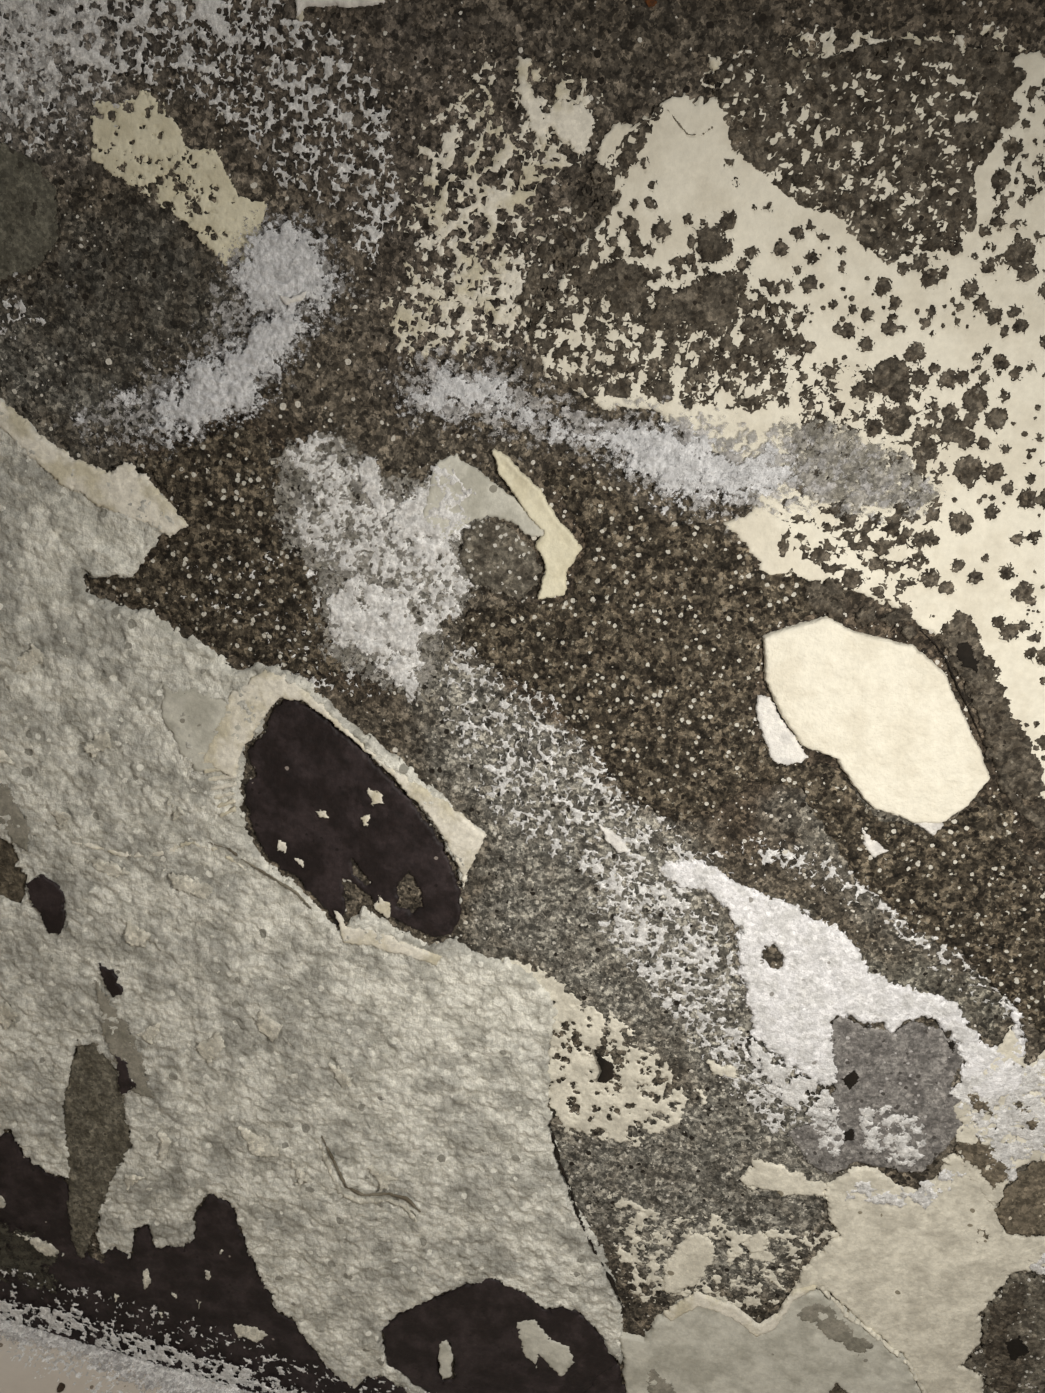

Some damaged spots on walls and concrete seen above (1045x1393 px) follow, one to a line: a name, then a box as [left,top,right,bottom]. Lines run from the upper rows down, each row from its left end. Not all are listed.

leakage [0,0,404,270]
leakage [0,272,46,340]
peeling [379,22,1045,799]
leakage [70,37,1045,1181]
flaking render [0,398,1045,1393]
leakage [0,1196,430,1393]
leakage [845,1155,967,1210]
leakage [1029,1253,1045,1275]